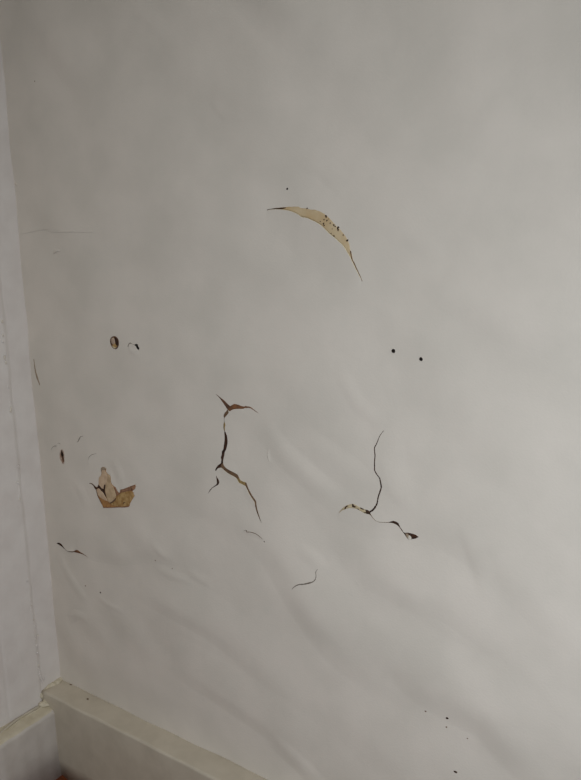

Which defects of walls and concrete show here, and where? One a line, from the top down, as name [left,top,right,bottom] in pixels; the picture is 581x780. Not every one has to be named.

peeling [265,207,362,296]
peeling [89,467,136,508]
crack [209,395,265,542]
crack [337,433,418,544]
crack [57,538,87,557]